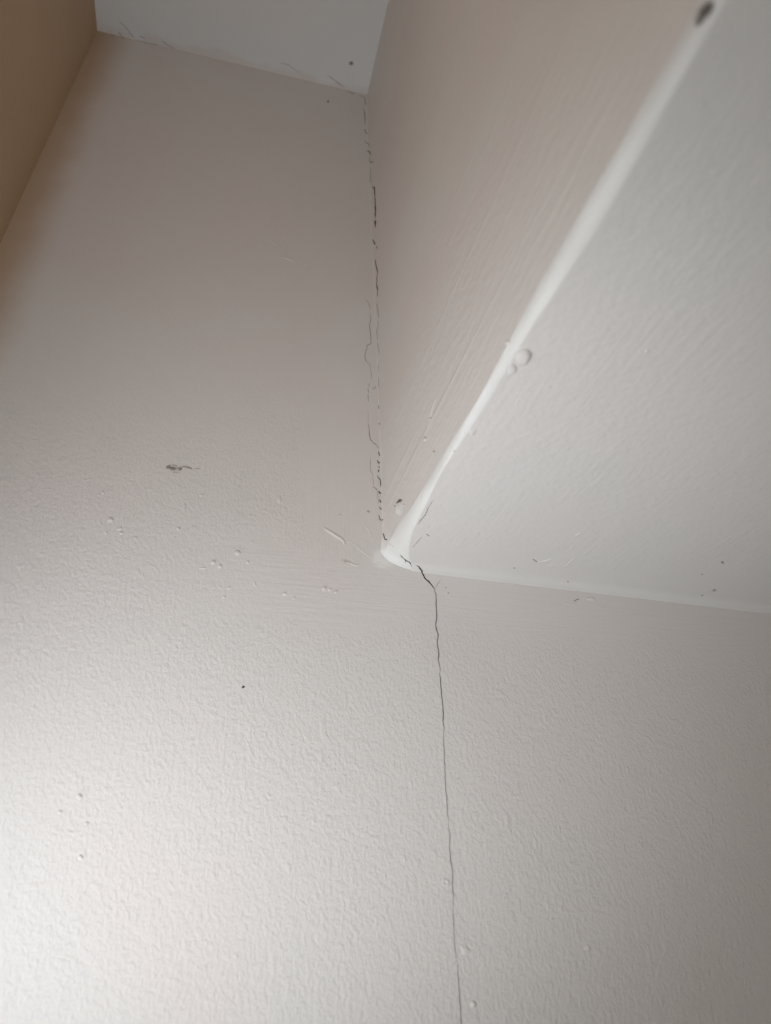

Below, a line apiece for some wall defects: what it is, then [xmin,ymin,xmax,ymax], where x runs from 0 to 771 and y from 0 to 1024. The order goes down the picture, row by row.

crack [329,76,462,1024]